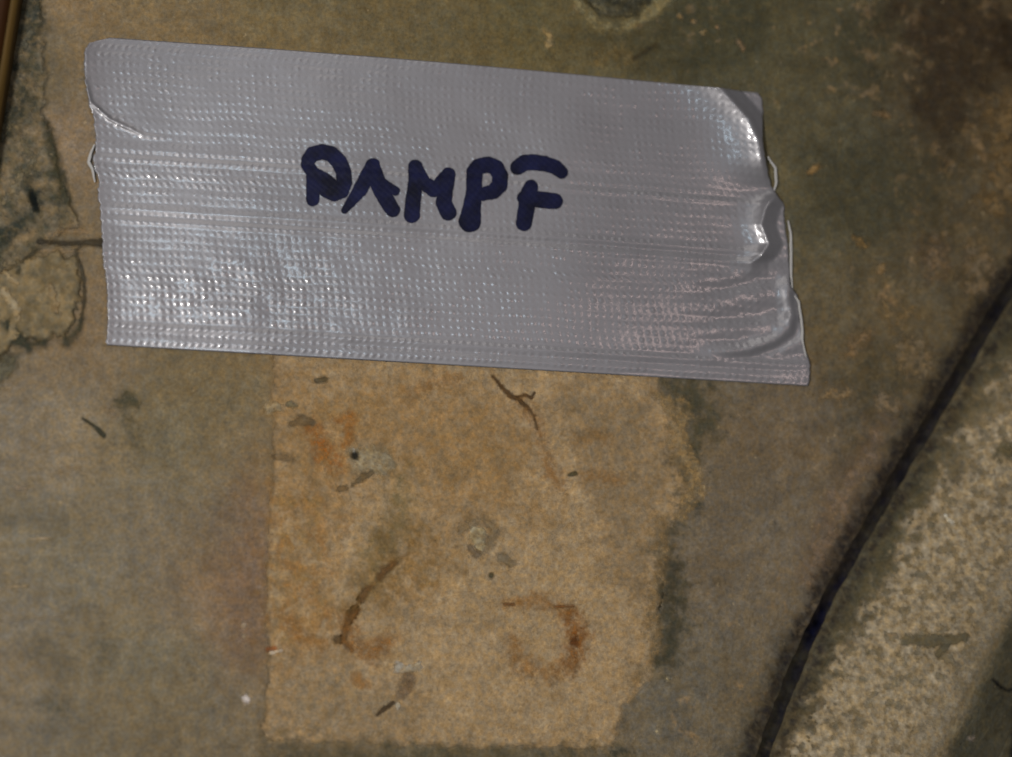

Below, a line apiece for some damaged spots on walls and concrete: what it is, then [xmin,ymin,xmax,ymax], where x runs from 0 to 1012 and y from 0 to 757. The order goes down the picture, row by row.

spalling [0,0,79,271]
corrosion [513,595,586,677]